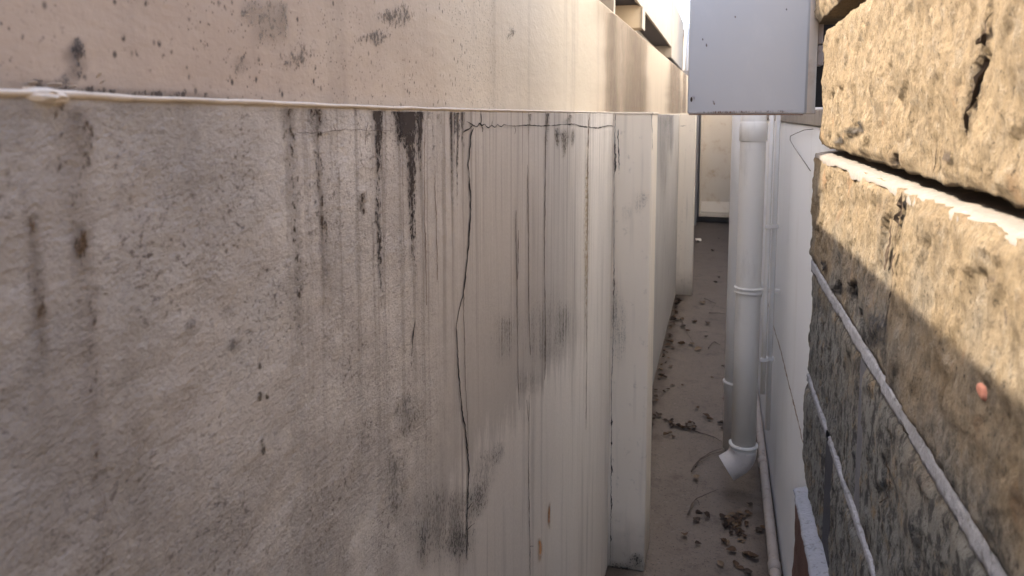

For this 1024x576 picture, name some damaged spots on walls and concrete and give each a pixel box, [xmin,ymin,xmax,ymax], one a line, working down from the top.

crack [963,11,994,136]
water stain [283,108,302,262]
water stain [310,109,328,239]
water stain [360,111,465,291]
crack [456,113,620,558]